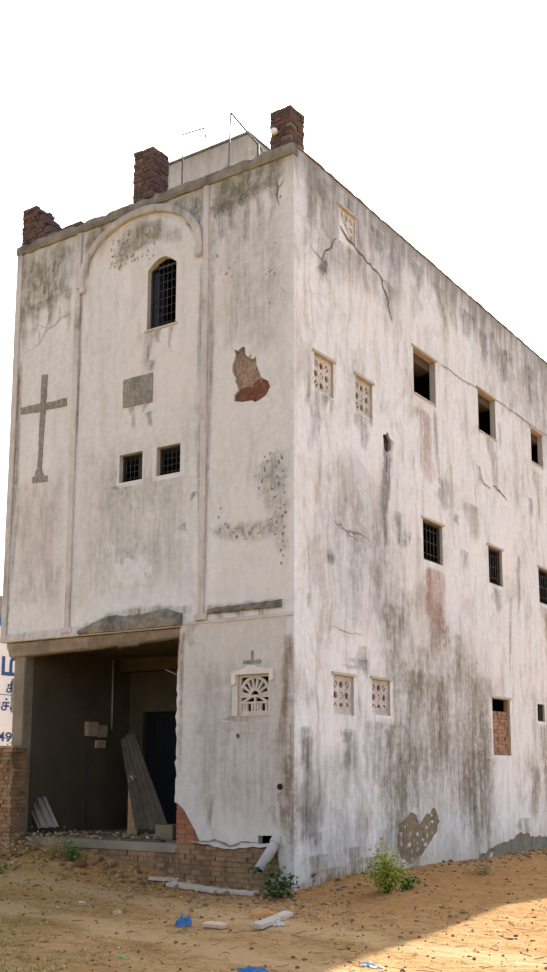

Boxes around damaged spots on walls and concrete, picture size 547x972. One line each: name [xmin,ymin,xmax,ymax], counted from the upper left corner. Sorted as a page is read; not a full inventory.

leakage [23,252,65,312]
crack [311,225,394,322]
crack [25,305,69,353]
flaking render [234,348,270,402]
flaking render [176,804,206,845]
flaking render [397,808,439,864]
flaking render [479,832,547,858]